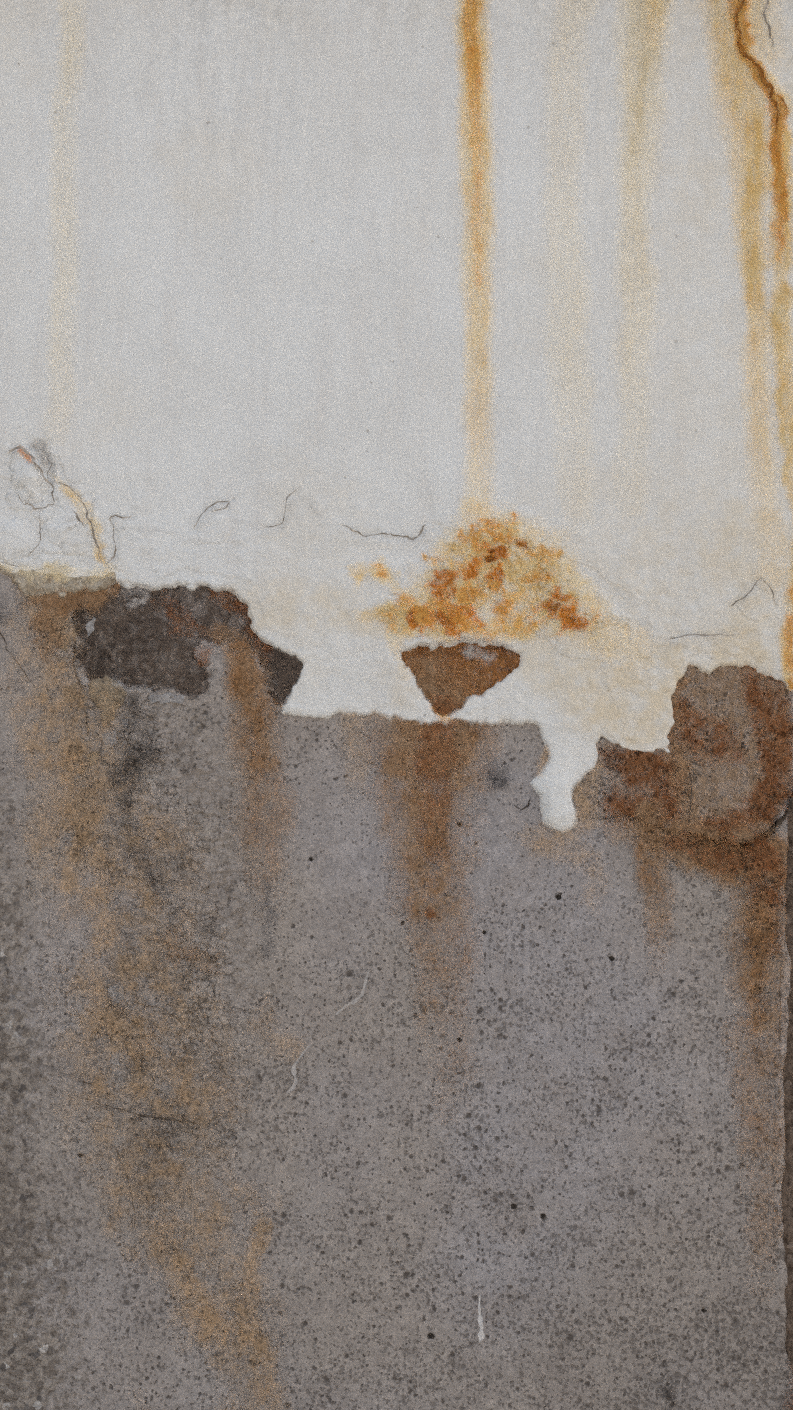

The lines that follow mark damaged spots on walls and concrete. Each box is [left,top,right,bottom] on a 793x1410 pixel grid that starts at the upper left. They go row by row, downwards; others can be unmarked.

corrosion [460,0,489,262]
crack [735,0,787,135]
corrosion [715,0,793,481]
spalling [0,565,303,749]
corrosion [218,637,278,771]
corrosion [382,659,485,930]
peeling [401,642,520,698]
corrosion [376,512,600,640]
spalling [606,665,793,839]
corrosion [782,618,793,689]